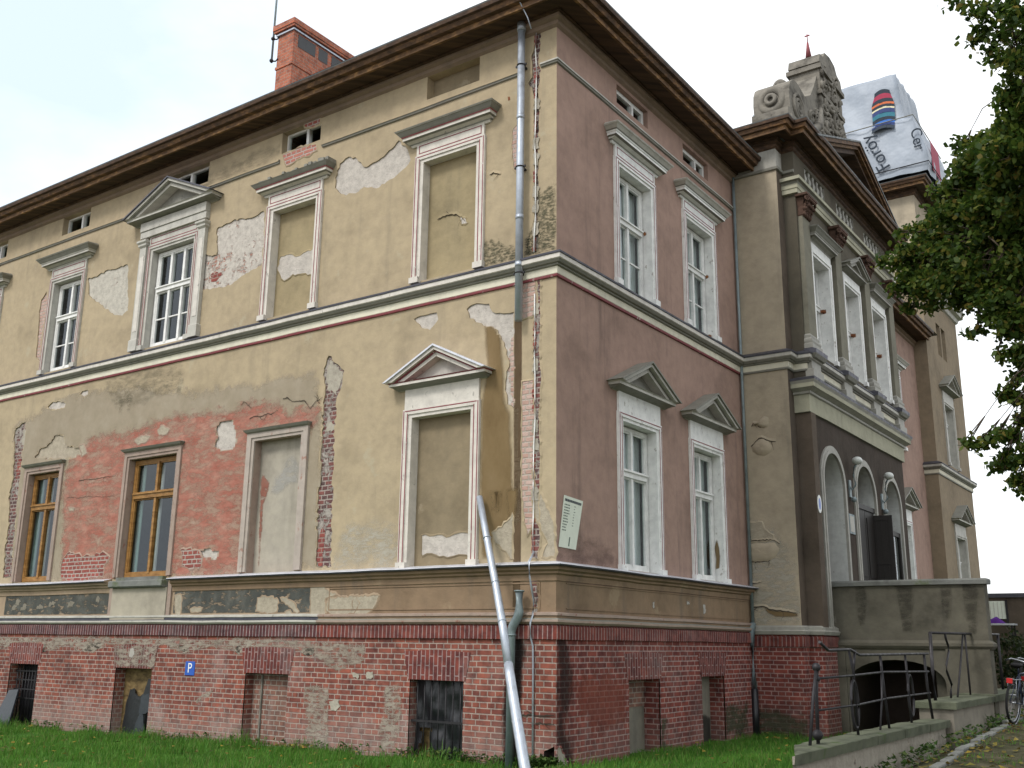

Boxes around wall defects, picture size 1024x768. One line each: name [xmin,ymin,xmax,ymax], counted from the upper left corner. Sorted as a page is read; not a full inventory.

spalling [335,140,411,195]
spalling [203,211,265,290]
spalling [88,264,128,316]
crack [241,395,321,420]
spalling [467,281,558,560]
peeling [3,356,344,583]
peeling [421,530,468,559]
peeling [4,594,109,615]
peeling [173,587,380,615]